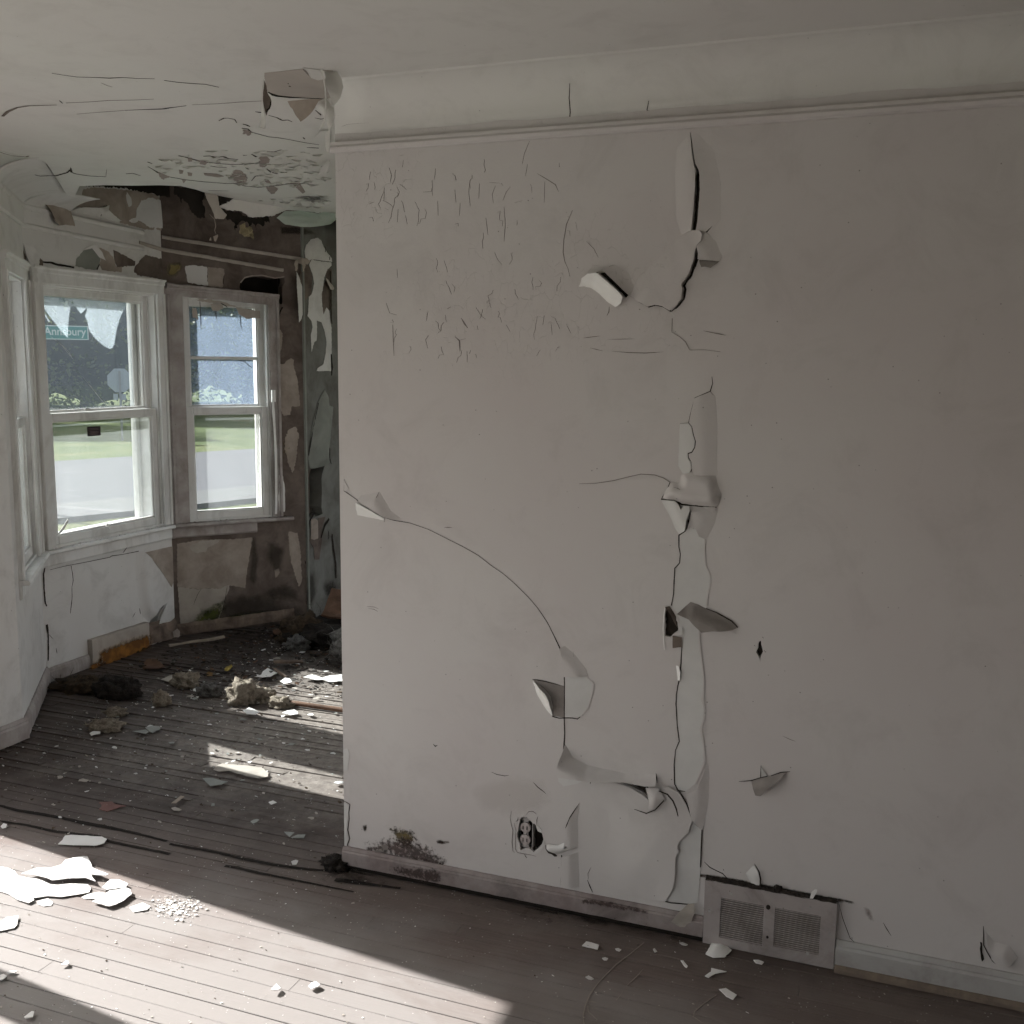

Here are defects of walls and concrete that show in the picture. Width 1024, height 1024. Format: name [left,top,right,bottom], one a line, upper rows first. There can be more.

peeling [128,68,343,219]
peeling [45,187,163,231]
crack [368,131,723,360]
peeling [294,238,334,371]
crack [327,271,335,323]
crack [678,380,718,476]
peeling [135,538,253,637]
crack [309,403,588,677]
peeling [591,500,738,905]
damp [363,826,449,883]
crack [560,804,593,892]
damp [583,899,646,913]